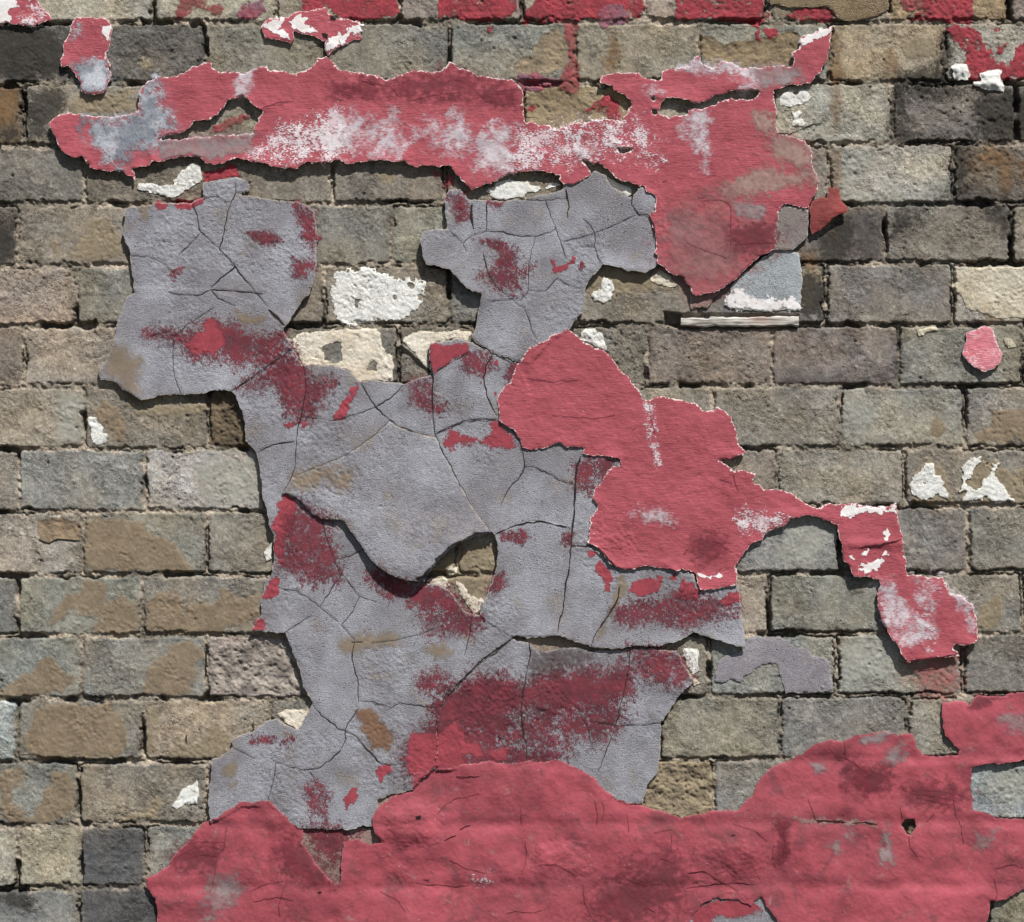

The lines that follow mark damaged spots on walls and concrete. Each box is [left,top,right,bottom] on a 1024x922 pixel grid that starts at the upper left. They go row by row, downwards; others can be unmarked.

peeling [60,16,119,96]
crack [451,189,656,337]
peeling [962,326,1002,372]
spalling [209,396,244,449]
crack [130,182,620,647]
peeling [732,511,782,533]
crack [202,646,210,677]
spalling [209,639,303,696]
crack [233,520,654,799]
peeling [999,713,1024,733]
peeling [280,838,326,884]
peeling [879,832,896,866]